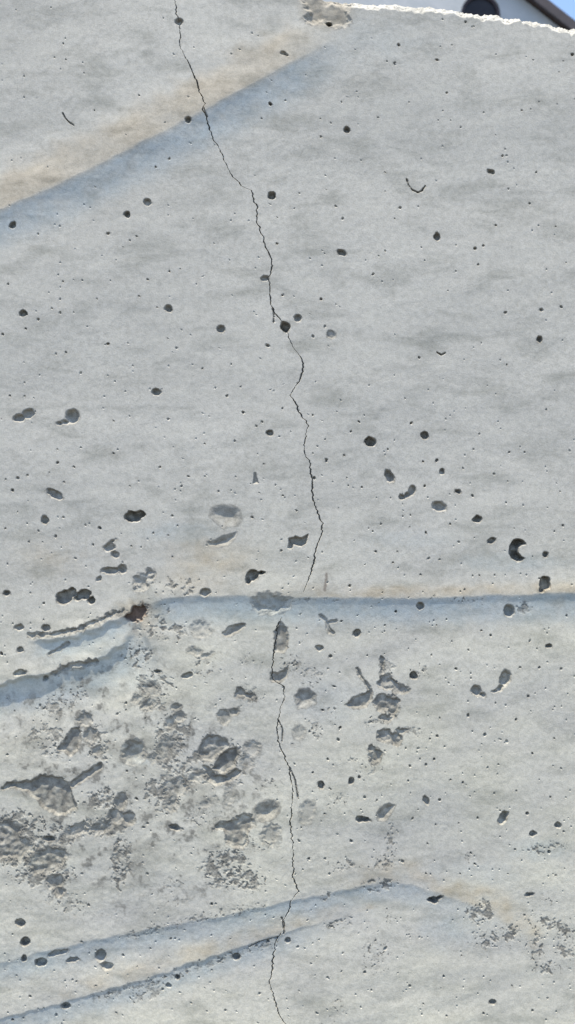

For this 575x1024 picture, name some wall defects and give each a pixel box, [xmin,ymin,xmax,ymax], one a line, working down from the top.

spalling [298,0,575,35]
crack [174,0,324,592]
spalling [0,567,433,942]
crack [248,618,300,1024]
spalling [427,593,497,604]